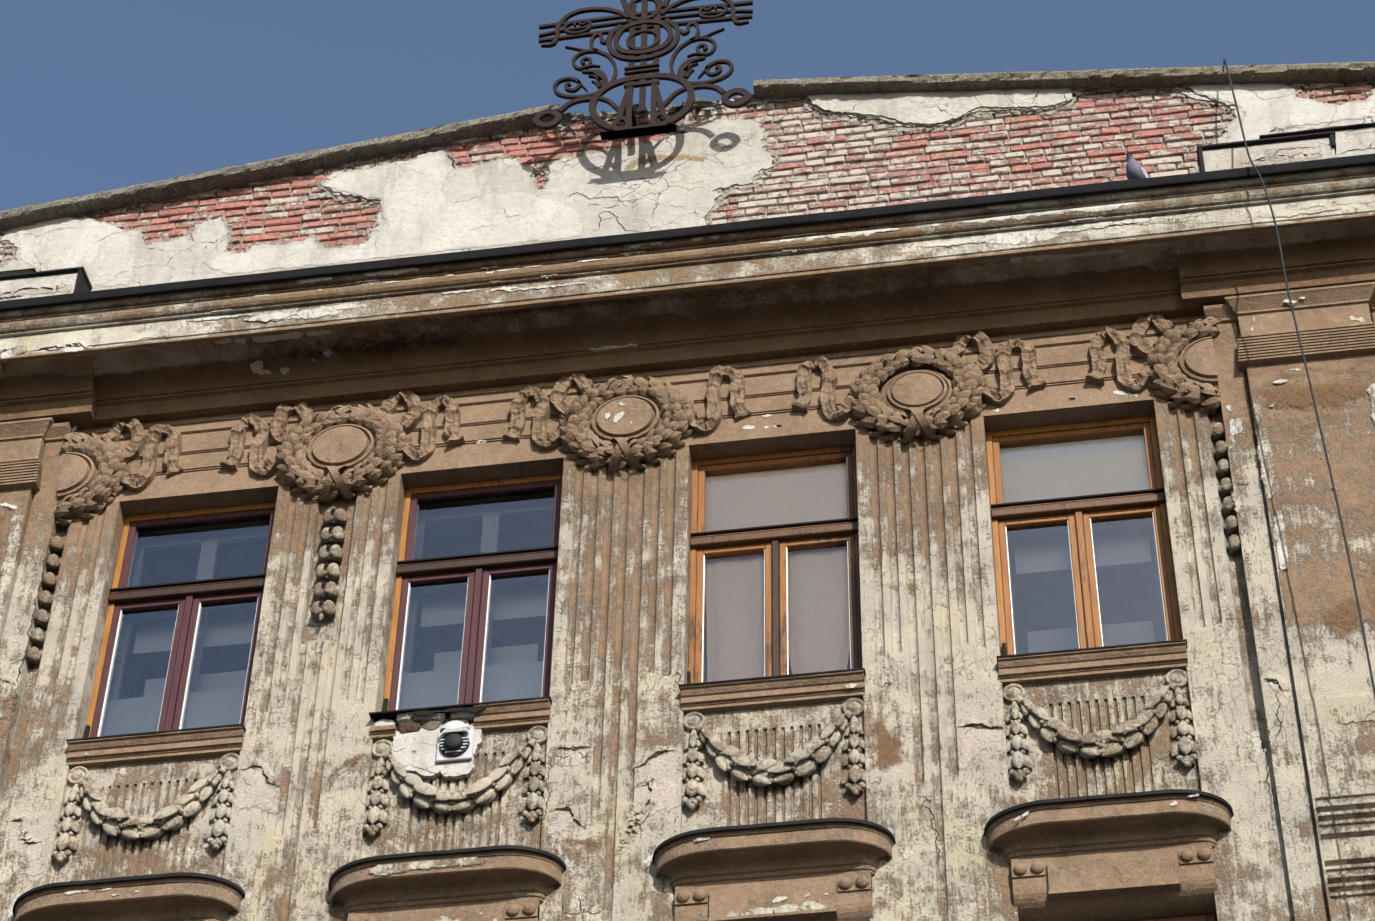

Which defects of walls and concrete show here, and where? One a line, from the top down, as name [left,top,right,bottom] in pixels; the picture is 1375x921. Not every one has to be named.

crack [565,165,632,232]
flaking render [70,81,1375,264]
peeling [0,231,73,299]
peeling [182,277,367,322]
peeling [442,265,586,294]
spalling [0,341,92,358]
peeling [1224,402,1289,571]
peeling [0,503,53,627]
peeling [0,675,20,737]
peeling [1247,730,1262,762]
crack [545,753,558,816]
spalling [0,814,52,918]